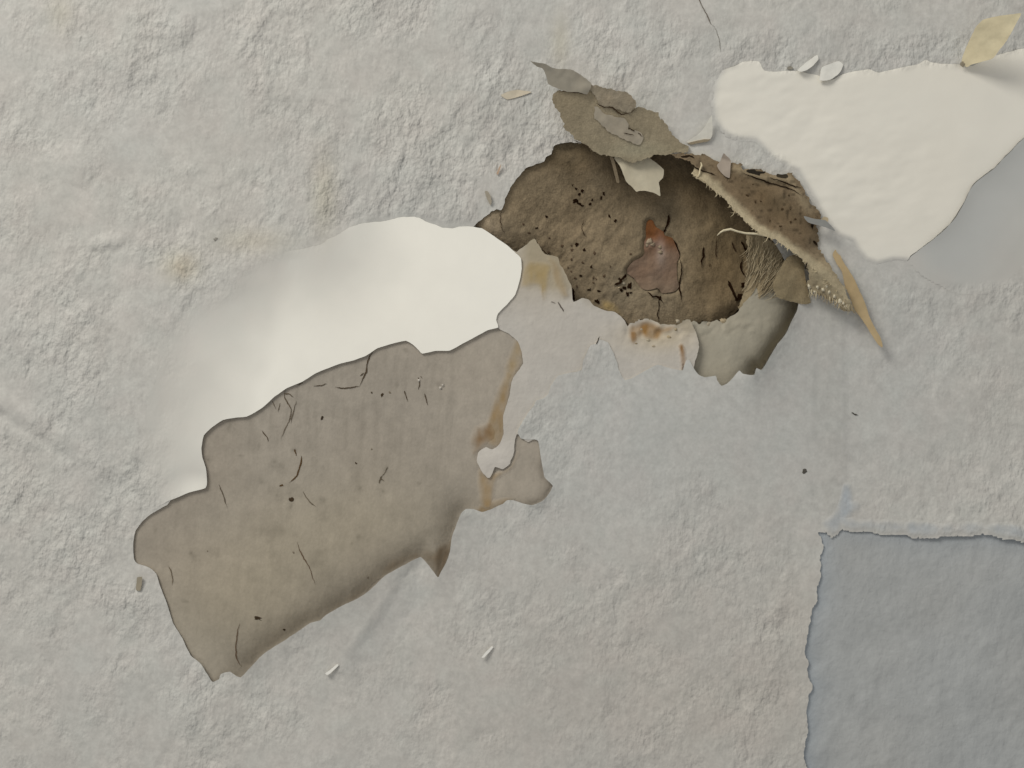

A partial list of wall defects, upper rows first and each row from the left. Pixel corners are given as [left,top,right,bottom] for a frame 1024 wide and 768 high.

peeling [590,84,643,145]
spalling [133,142,798,682]